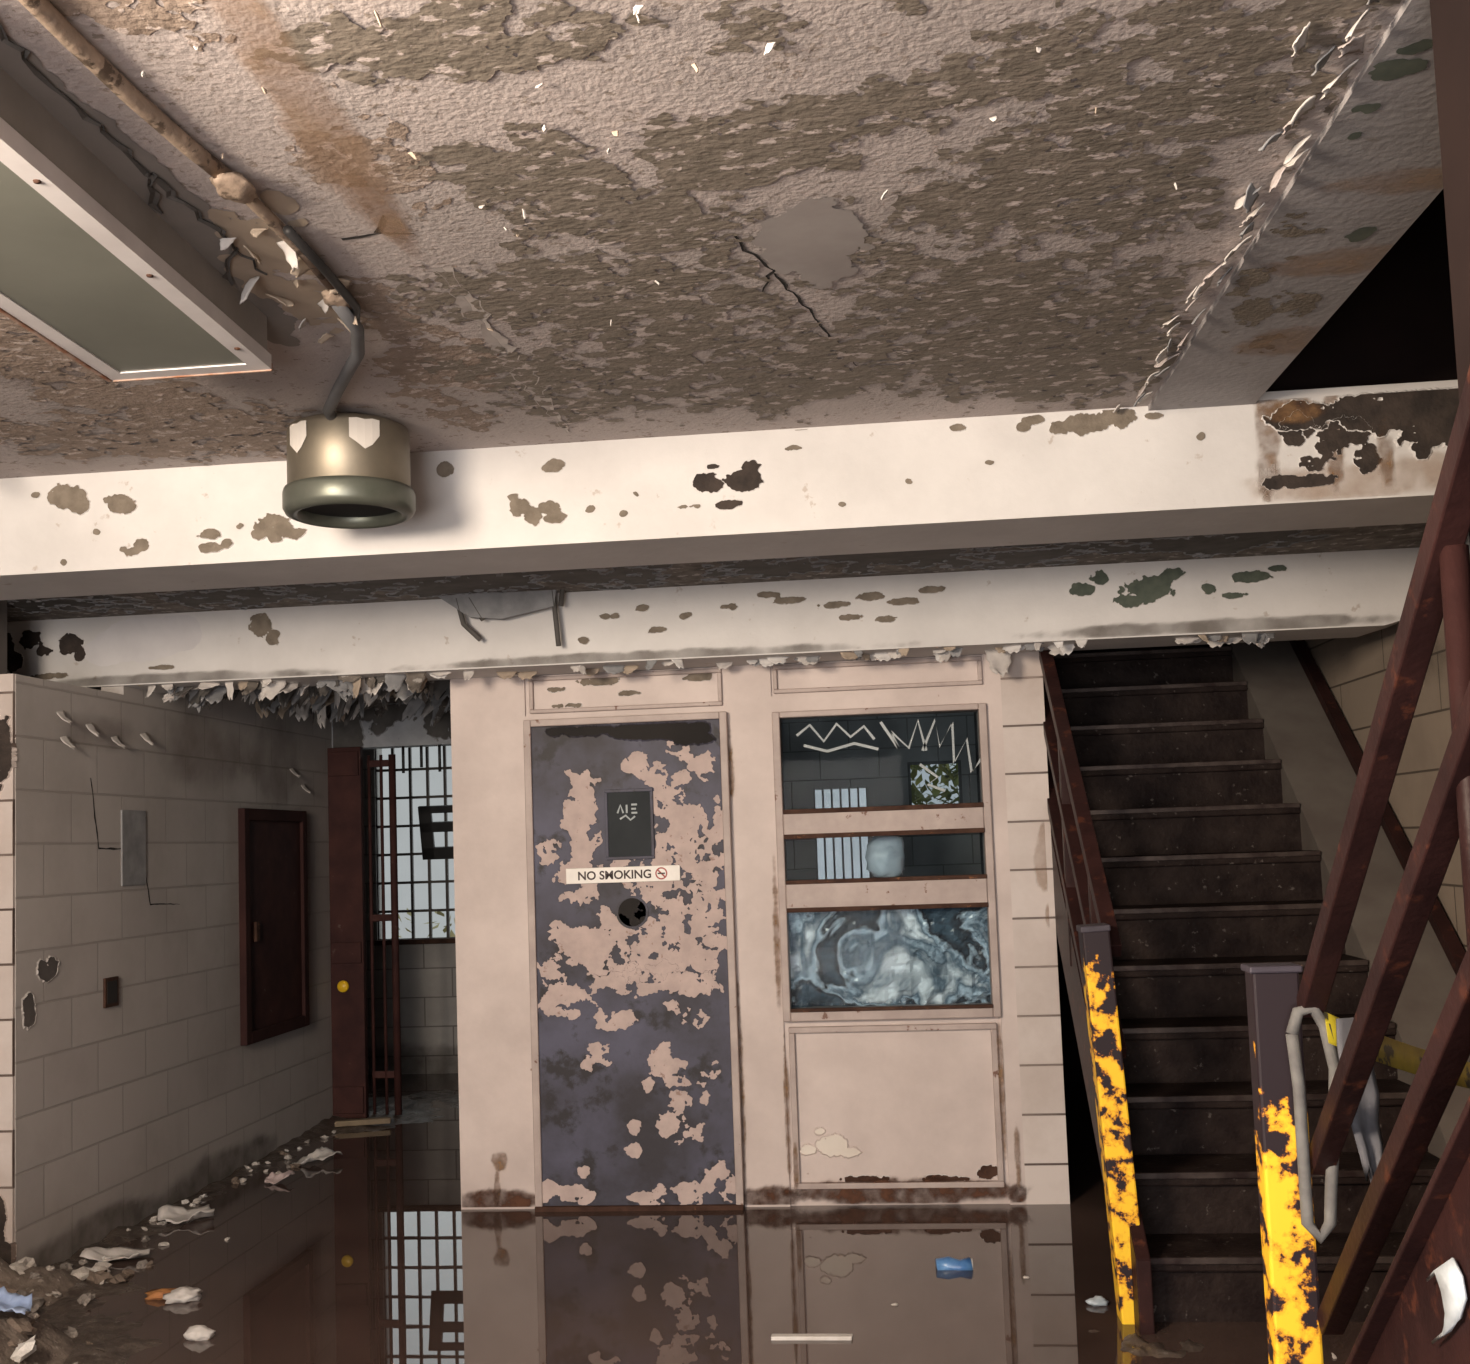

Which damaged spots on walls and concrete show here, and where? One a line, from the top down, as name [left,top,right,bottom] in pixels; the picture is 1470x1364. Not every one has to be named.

crack [0,24,267,286]
peeling [0,0,1433,465]
crack [734,236,857,366]
peeling [678,459,764,511]
peeling [1260,386,1459,491]
peeling [7,564,693,680]
peeling [698,530,1331,623]
peeling [145,664,474,748]
peeling [496,656,821,1073]
peeling [623,1041,721,1159]
peeling [542,1165,597,1206]
peeling [626,1160,736,1205]